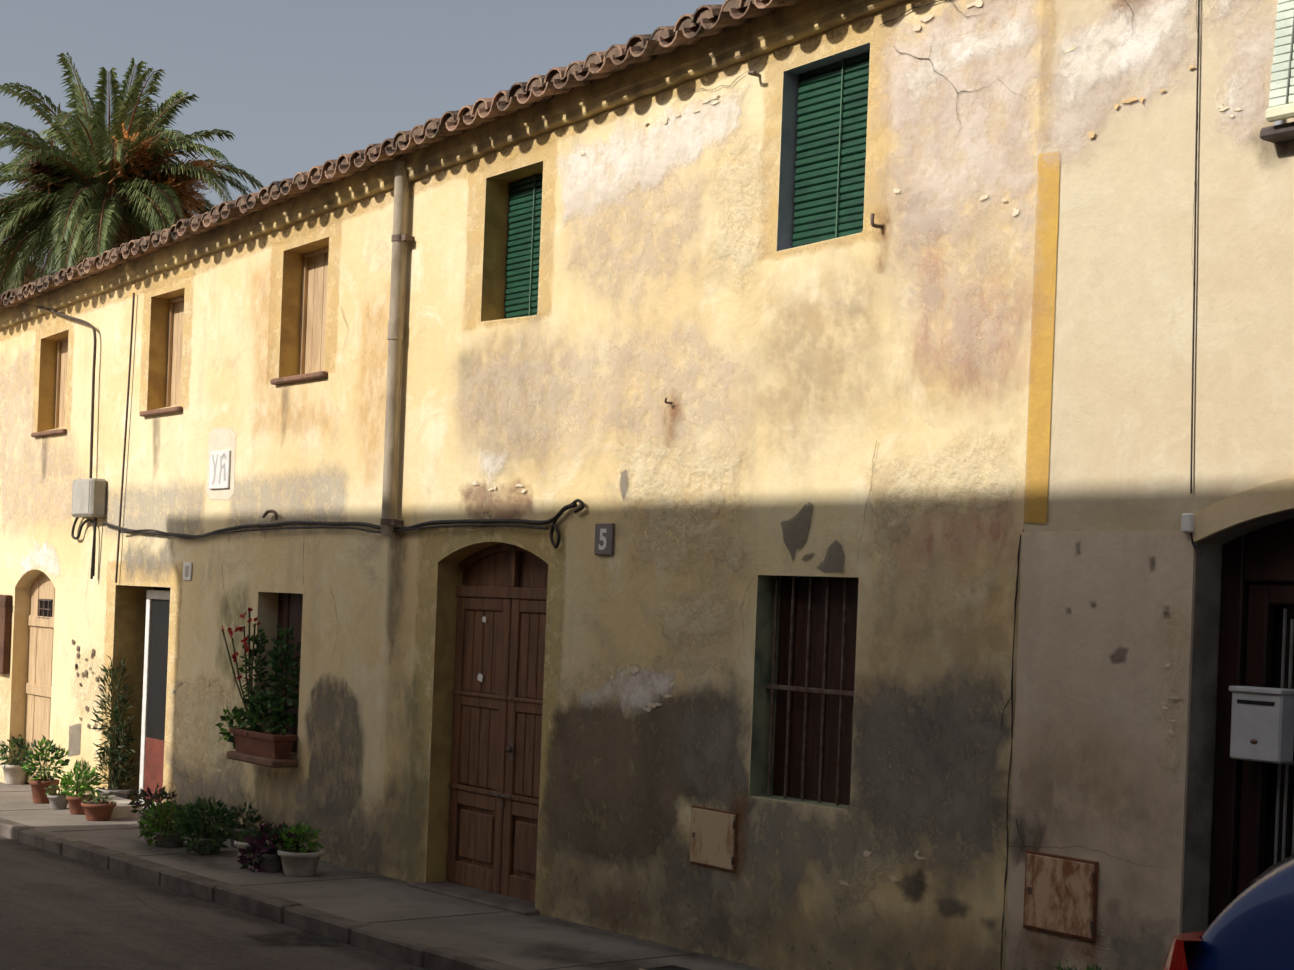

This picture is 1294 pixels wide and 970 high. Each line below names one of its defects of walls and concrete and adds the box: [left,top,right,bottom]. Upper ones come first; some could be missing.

peeling [561,94,740,221]
crack [879,0,1020,148]
peeling [885,0,1195,248]
spalling [463,452,531,524]
spalling [781,502,844,573]
leakage [164,761,259,834]
leakage [272,679,419,881]
peeling [581,666,673,712]
leakage [541,674,1044,970]
crack [1000,535,1161,970]